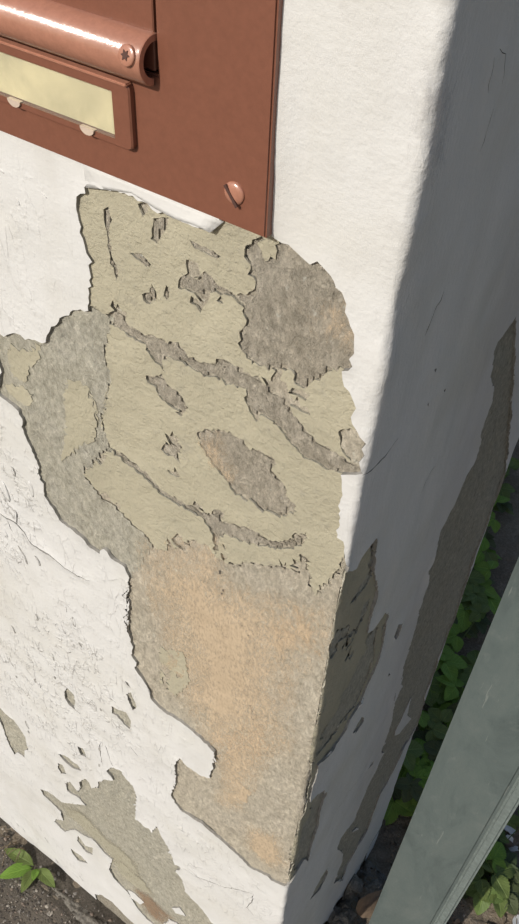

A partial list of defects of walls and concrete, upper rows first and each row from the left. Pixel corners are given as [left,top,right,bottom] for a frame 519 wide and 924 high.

peeling [0,165,387,884]
peeling [313,321,515,894]
peeling [504,825,519,851]